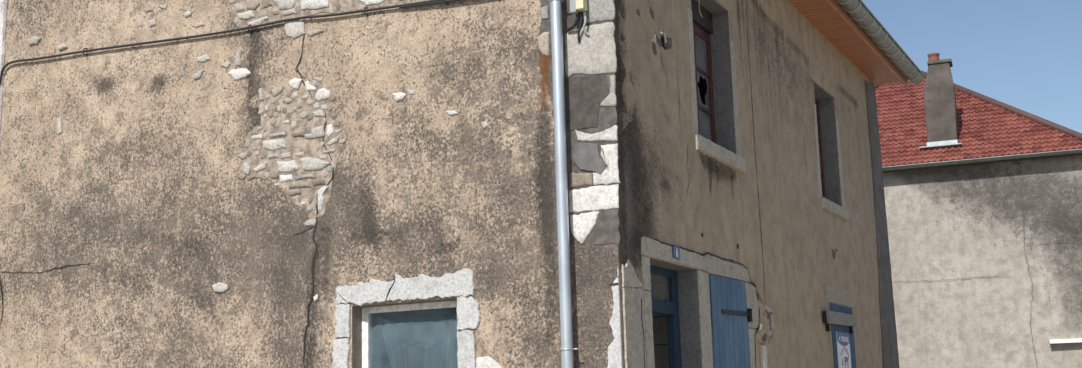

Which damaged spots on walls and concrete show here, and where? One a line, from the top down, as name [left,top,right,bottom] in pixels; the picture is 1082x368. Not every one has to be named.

flaking render [228,0,406,39]
flaking render [192,48,252,80]
flaking render [392,89,415,102]
flaking render [538,0,621,246]
flaking render [238,77,346,226]
crack [295,35,347,368]
flaking render [476,356,502,368]